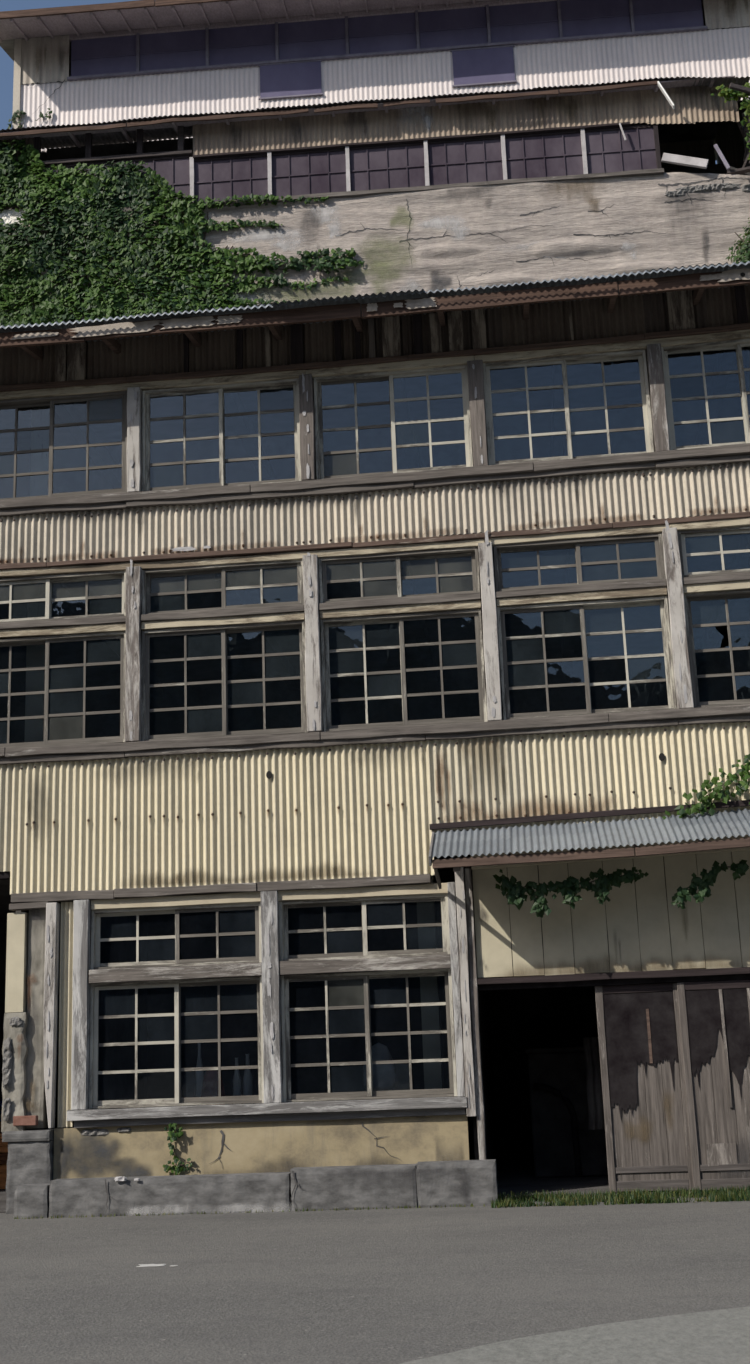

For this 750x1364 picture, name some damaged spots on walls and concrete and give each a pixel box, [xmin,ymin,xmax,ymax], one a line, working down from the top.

crack [335,177,750,288]
peeling [603,989,750,1118]
leakage [60,1136,150,1178]
crack [209,1130,231,1169]
crack [362,1123,400,1160]